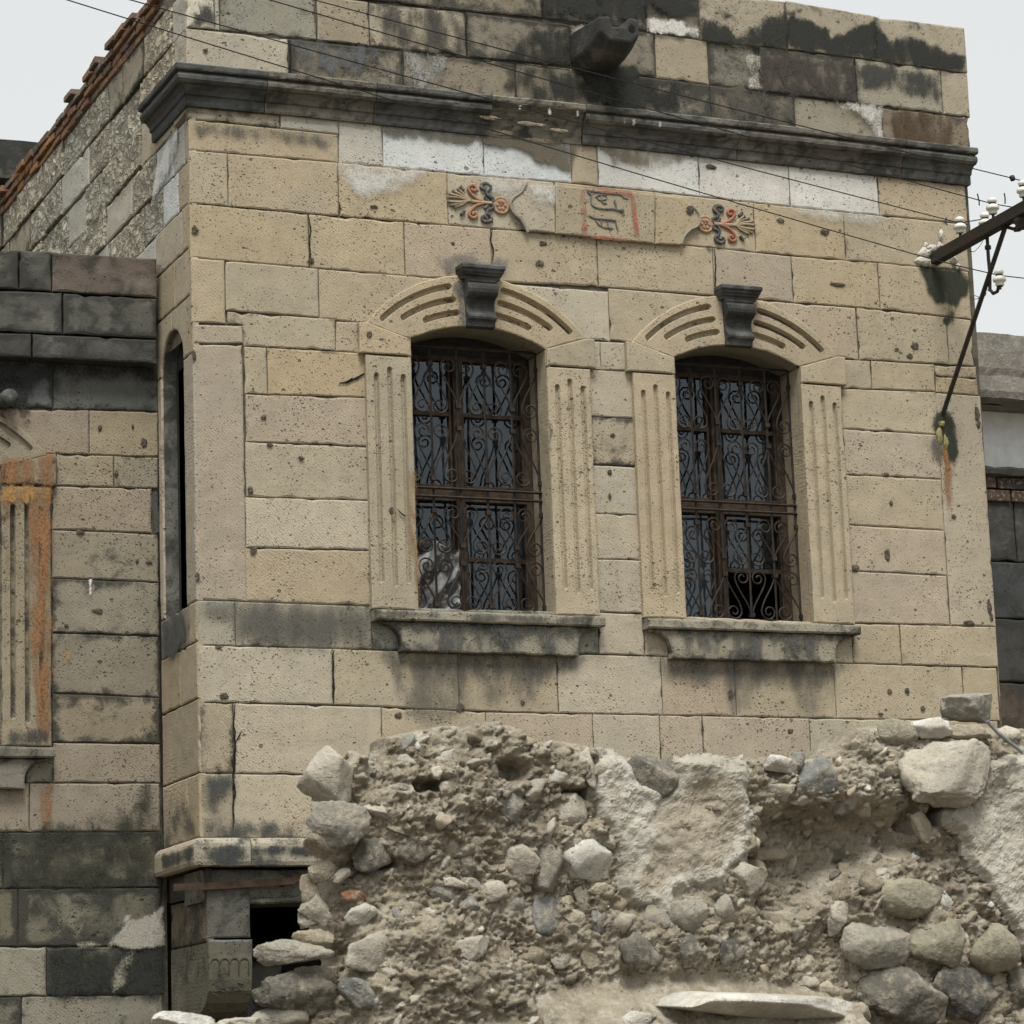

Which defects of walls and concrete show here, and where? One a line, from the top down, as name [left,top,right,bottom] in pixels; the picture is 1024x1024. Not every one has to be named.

water stain [382,126,576,171]
crack [305,215,313,265]
water stain [920,265,970,321]
corrosion [943,445,952,504]
corrosion [1,452,55,743]
water stain [0,773,310,890]
crack [232,703,242,828]
peeling [330,720,605,919]
peeling [746,729,1008,965]
peeling [998,726,1024,751]
water stain [48,948,166,998]
peeling [453,906,585,1024]